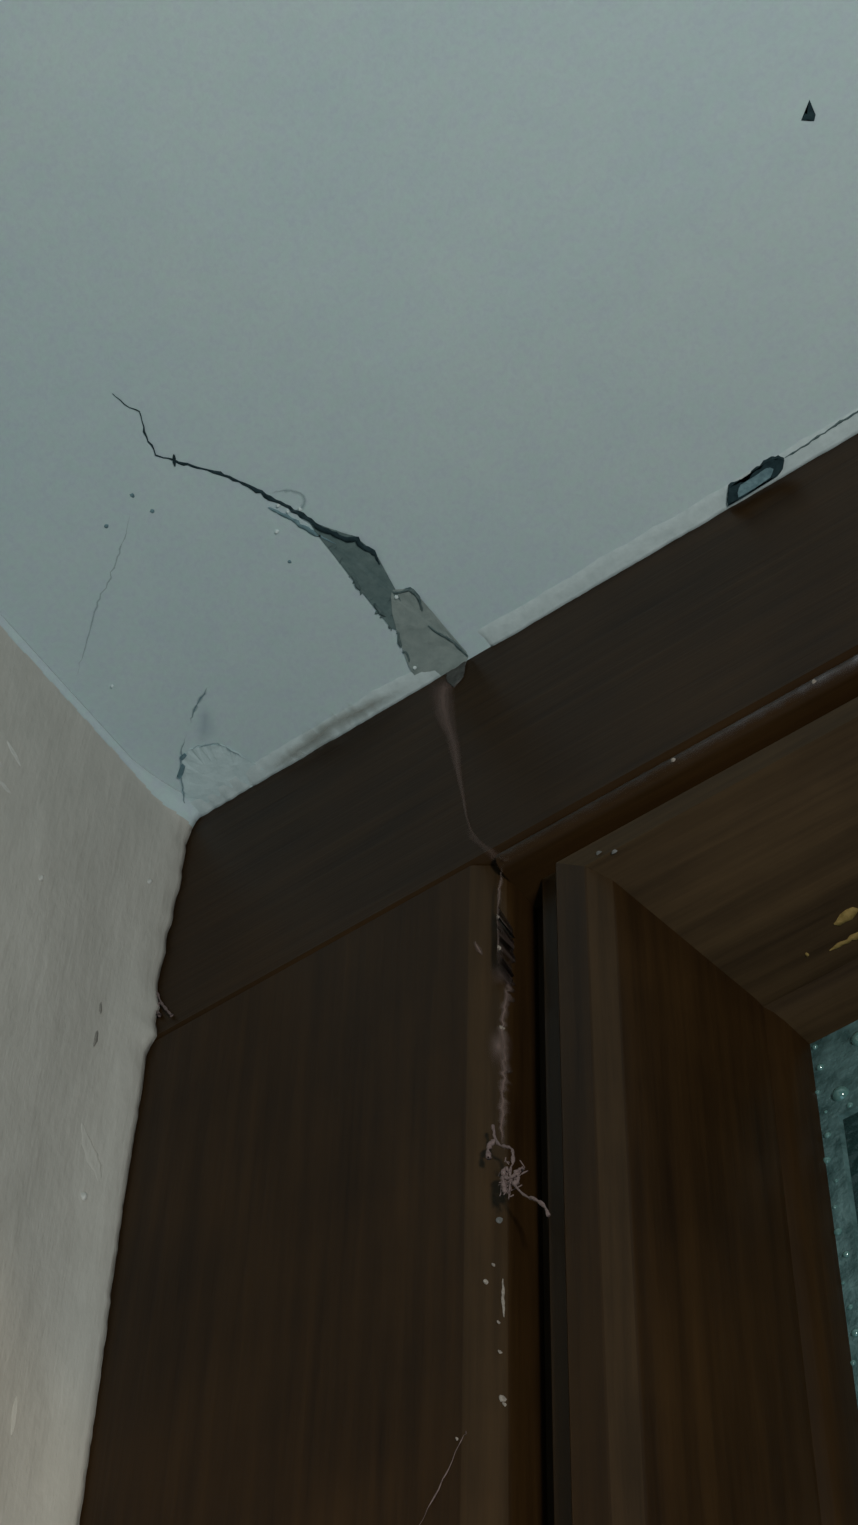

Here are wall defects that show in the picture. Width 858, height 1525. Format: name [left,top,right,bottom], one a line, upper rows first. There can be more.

crack [112,393,468,676]
spalling [727,455,784,506]